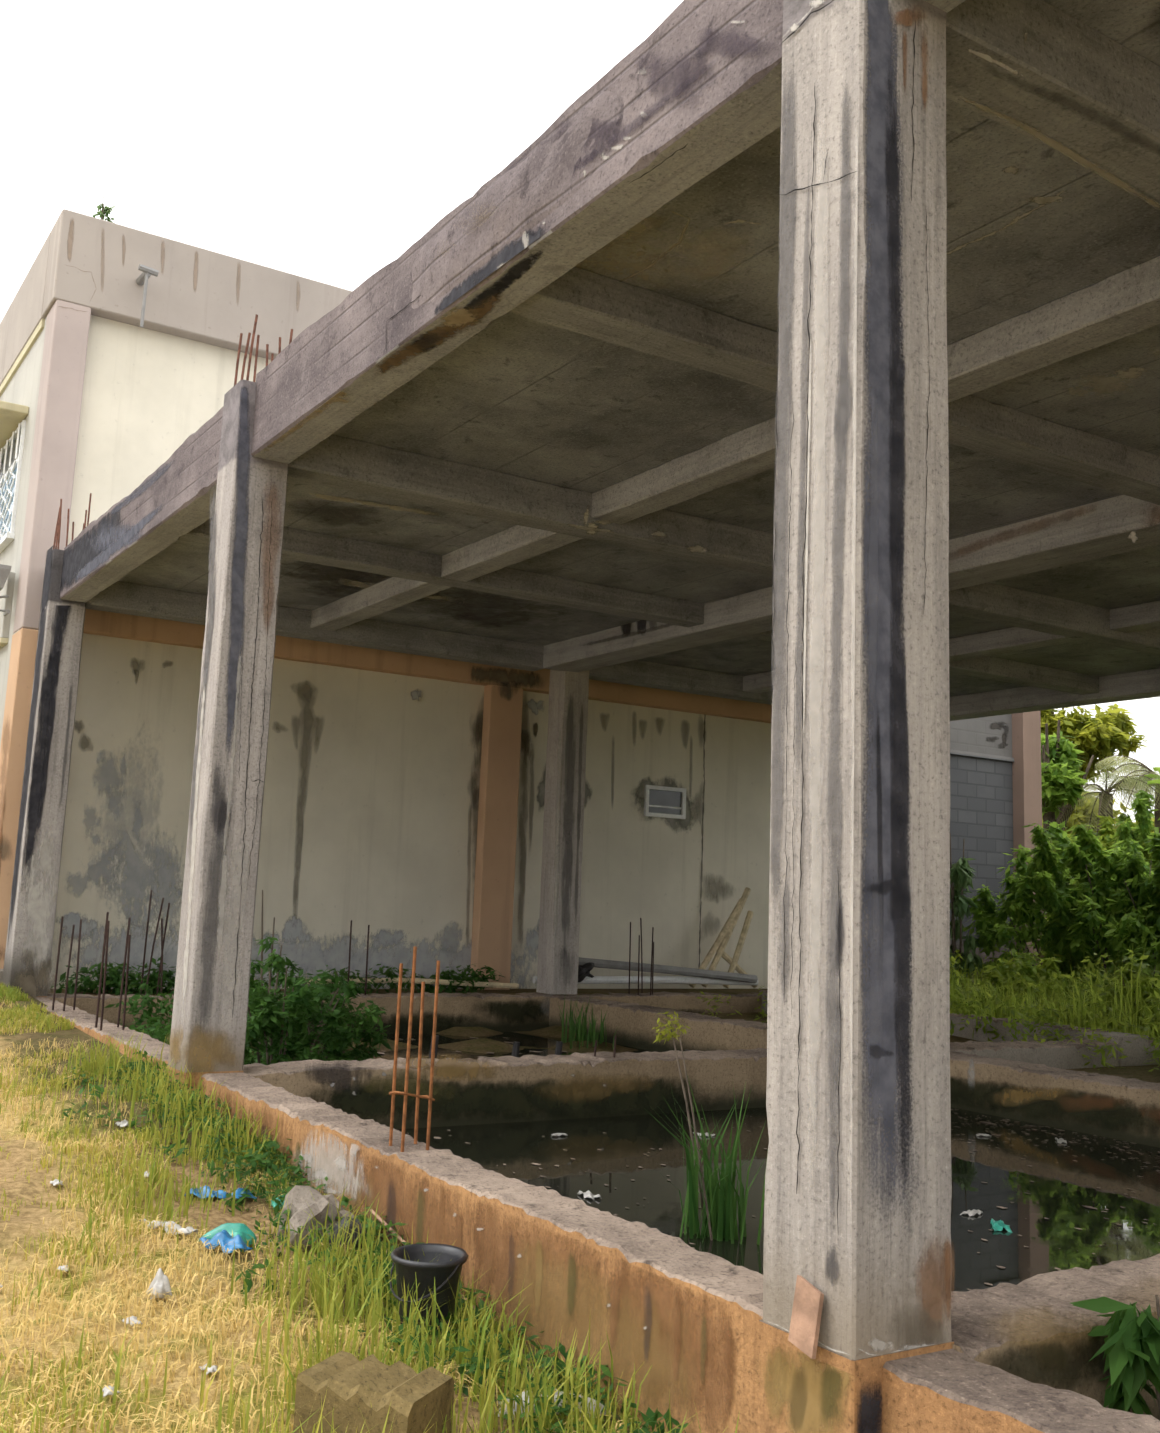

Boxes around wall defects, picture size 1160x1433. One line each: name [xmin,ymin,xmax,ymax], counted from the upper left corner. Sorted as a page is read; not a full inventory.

leakage [574,123,630,175]
corrosion [897,9,927,104]
spalling [378,227,544,373]
leakage [8,464,170,997]
leakage [275,683,319,917]
leakage [471,667,543,937]
leakage [771,88,811,894]
crack [771,86,857,1224]
leakage [826,0,913,1216]